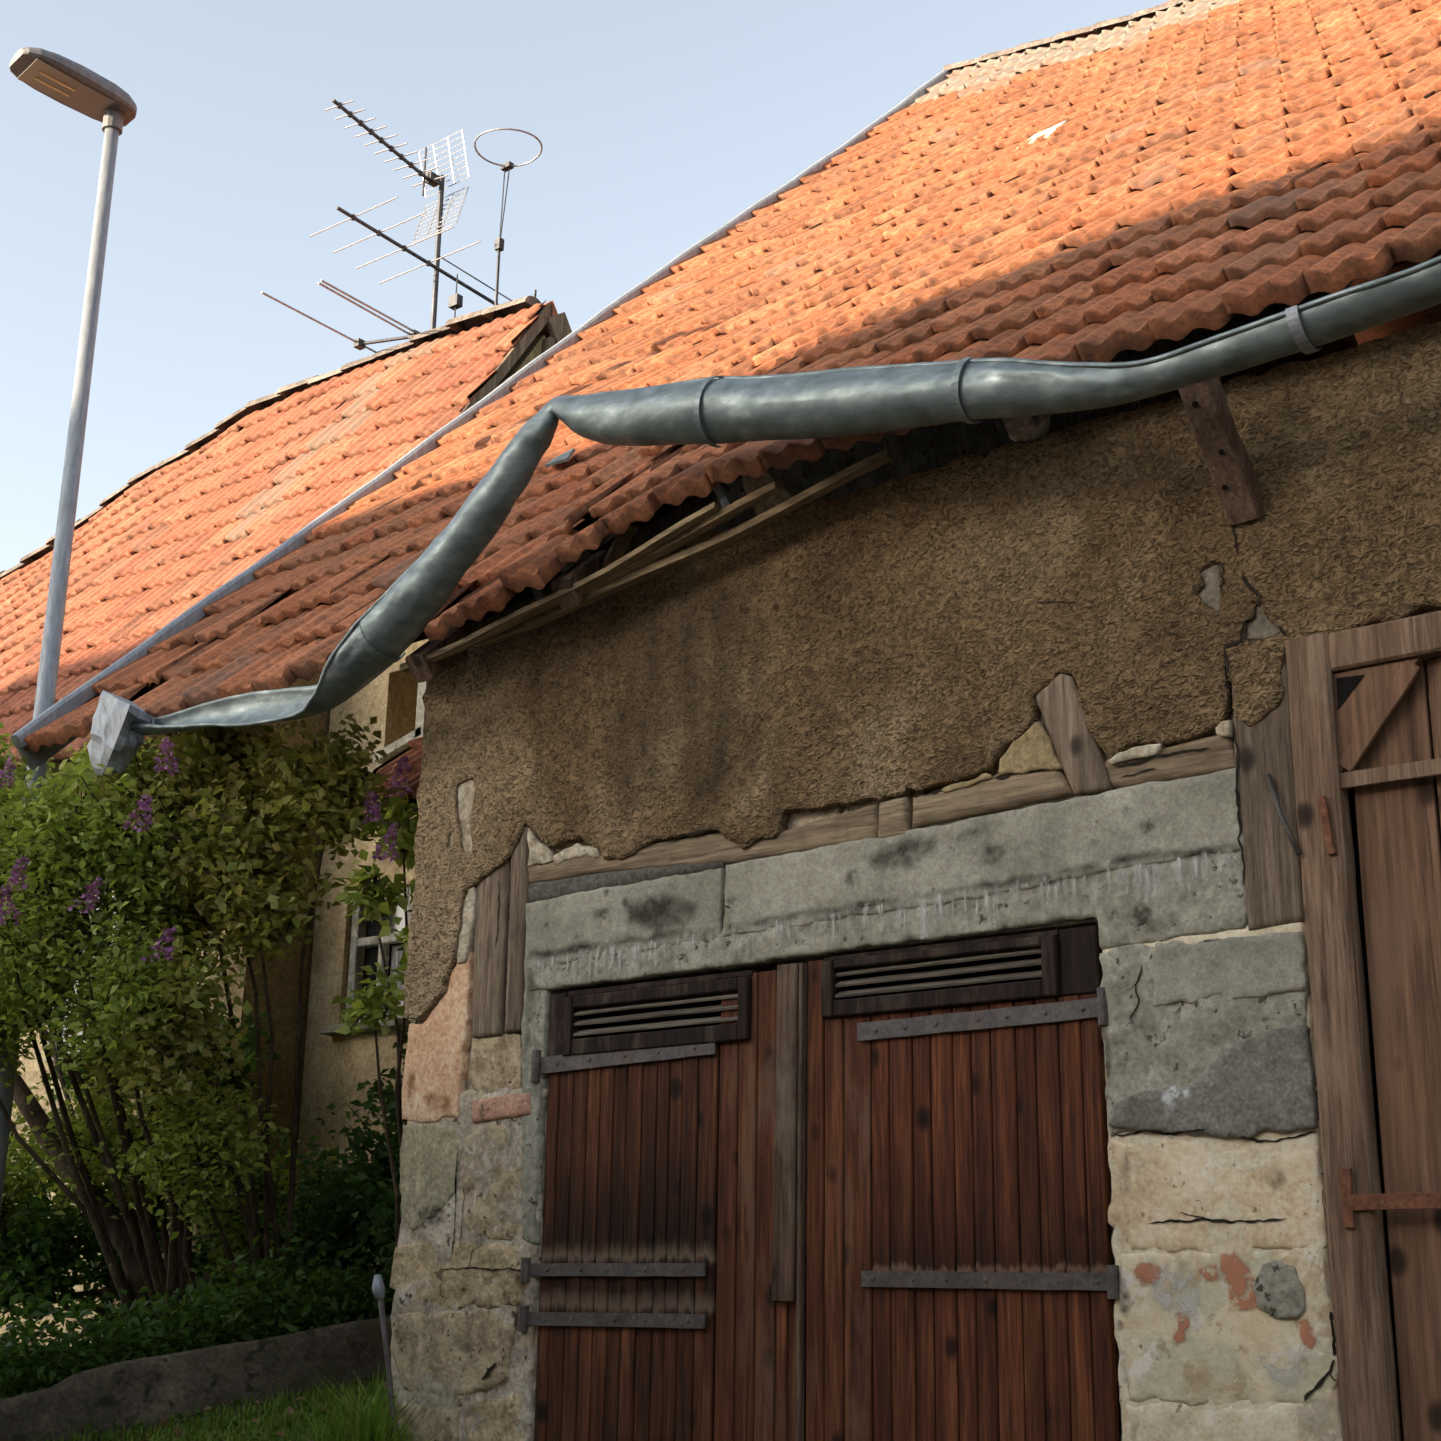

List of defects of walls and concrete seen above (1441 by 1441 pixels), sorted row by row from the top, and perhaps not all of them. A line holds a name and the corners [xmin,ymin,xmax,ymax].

peeling [1198,564,1220,612]
crack [1117,525,1287,886]
peeling [942,721,1064,793]
peeling [1107,744,1166,766]
peeling [449,780,475,853]
peeling [527,828,601,866]
peeling [457,887,477,964]
leakage [537,898,712,978]
crack [1126,966,1142,1020]
crack [1114,1129,1205,1137]
crack [1239,1131,1314,1143]
crack [1148,1212,1287,1224]